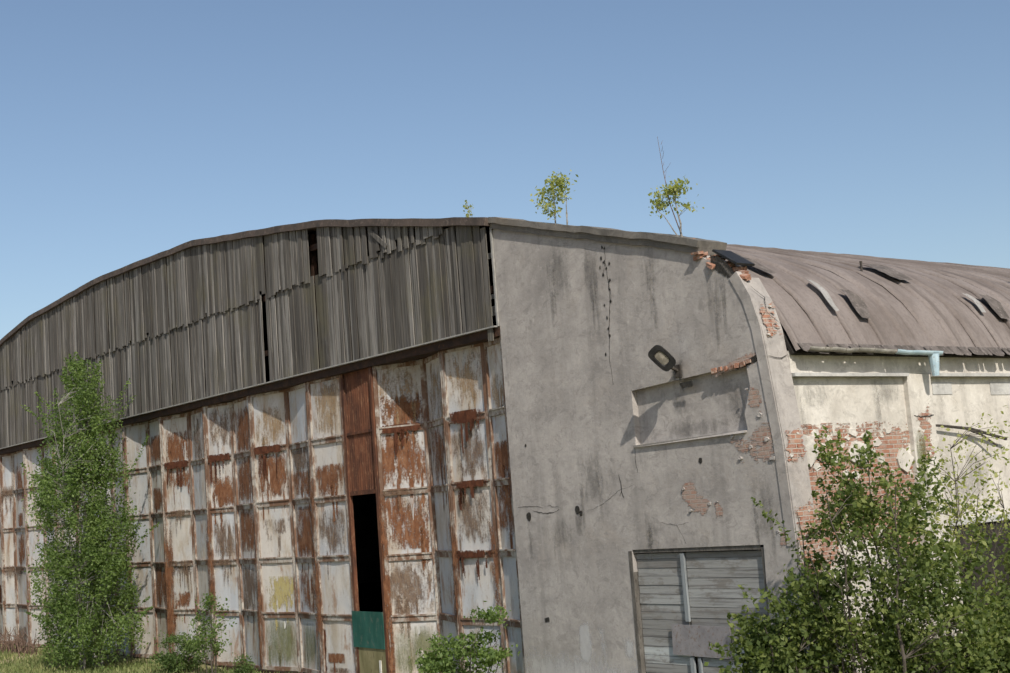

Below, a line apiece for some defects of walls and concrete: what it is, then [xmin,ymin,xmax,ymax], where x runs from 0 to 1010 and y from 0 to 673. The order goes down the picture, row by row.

rust [0,467,25,614]
rust [150,406,348,673]
rust [313,382,340,446]
rust [379,353,513,673]
spalling [691,249,755,281]
spalling [711,352,758,377]
flaking render [760,301,783,337]
flaking render [730,387,935,574]